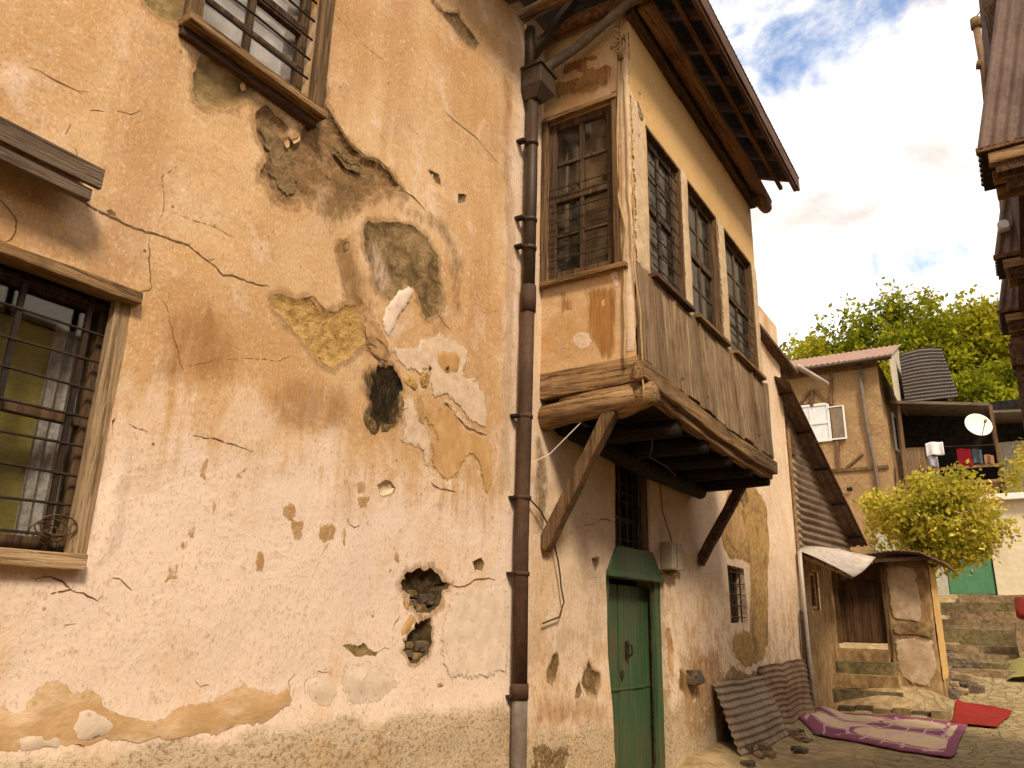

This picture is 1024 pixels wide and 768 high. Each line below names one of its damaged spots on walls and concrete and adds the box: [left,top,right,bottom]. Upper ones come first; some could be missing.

flaking render [255,87,405,210]
crack [86,166,289,370]
flaking render [272,158,514,500]
flaking render [0,680,292,752]
flaking render [401,568,508,687]
flaking render [547,653,559,684]
flaking render [575,661,600,699]
flaking render [722,708,734,741]
flaking render [721,488,770,682]